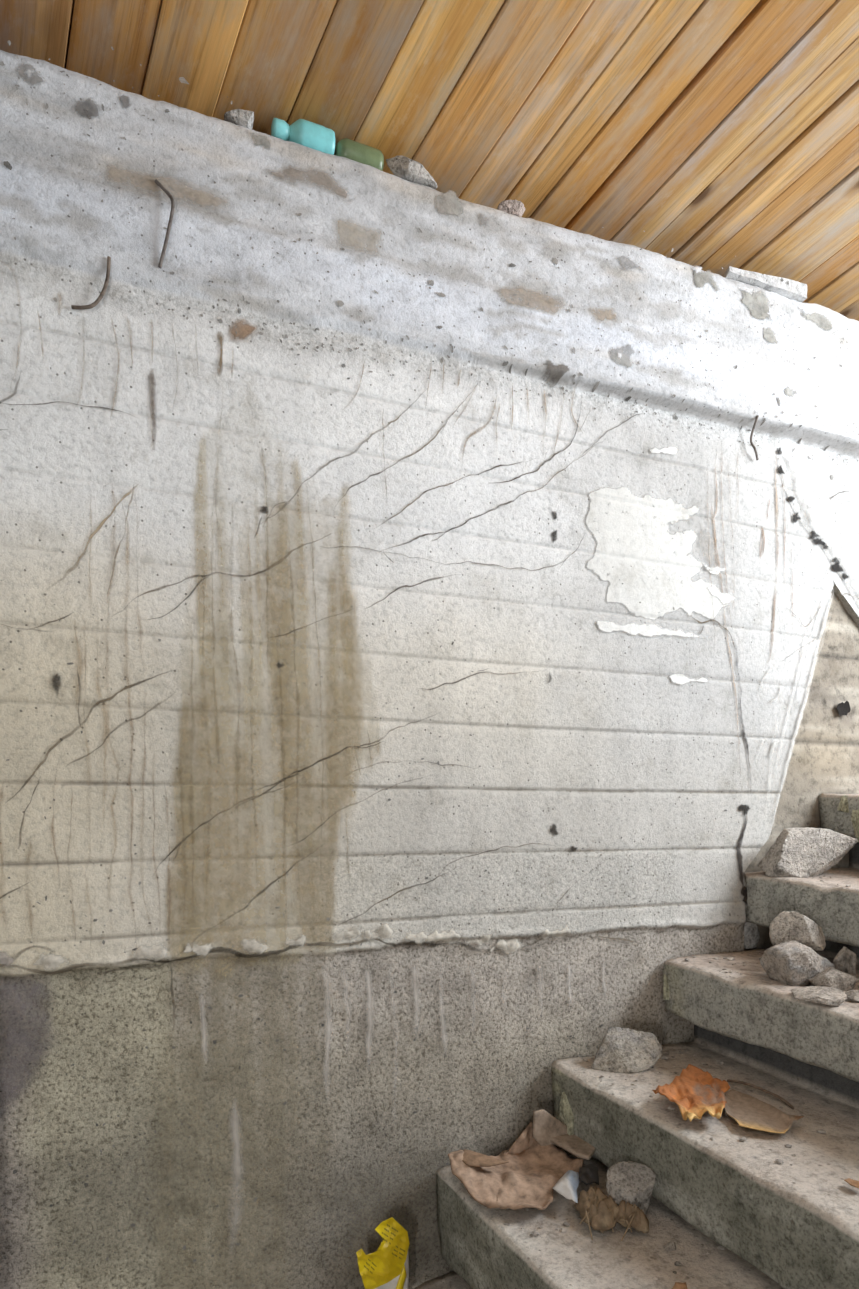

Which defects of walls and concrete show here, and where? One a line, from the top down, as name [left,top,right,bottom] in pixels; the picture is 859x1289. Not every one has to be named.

crack [0,382,125,413]
crack [71,490,132,570]
crack [141,545,303,619]
crack [255,402,463,536]
crack [360,415,635,606]
peeling [585,487,734,638]
crack [15,676,154,846]
leakage [176,530,311,977]
crack [164,723,410,860]
peeling [669,674,708,685]
crack [737,805,750,903]
crack [740,699,750,768]